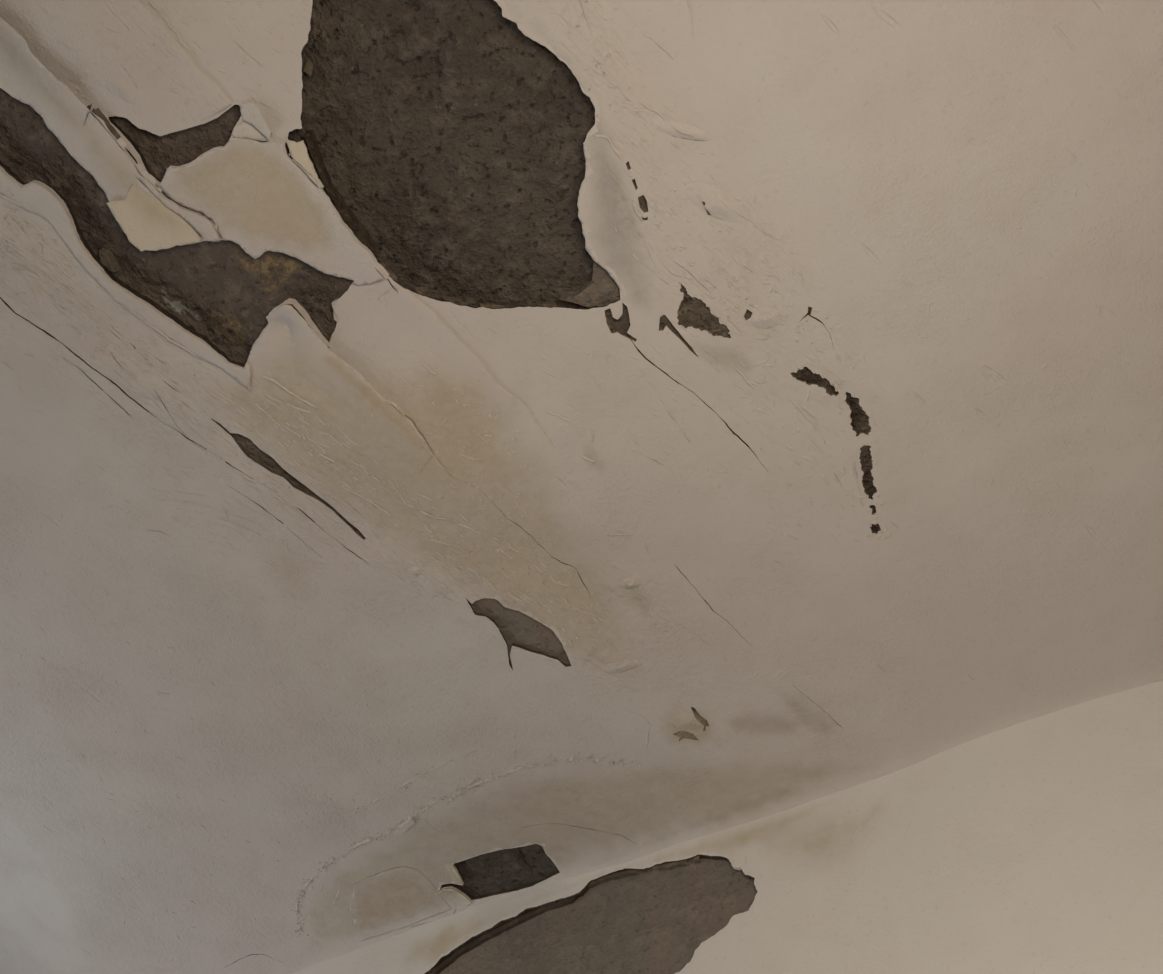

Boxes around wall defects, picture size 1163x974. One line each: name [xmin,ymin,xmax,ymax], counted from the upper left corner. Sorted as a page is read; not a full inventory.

spalling [0,0,637,474]
spalling [626,161,648,220]
spalling [659,284,731,357]
crack [0,297,367,563]
spalling [211,418,365,540]
spalling [465,597,571,672]
flaking render [350,844,560,941]
spalling [425,854,757,974]